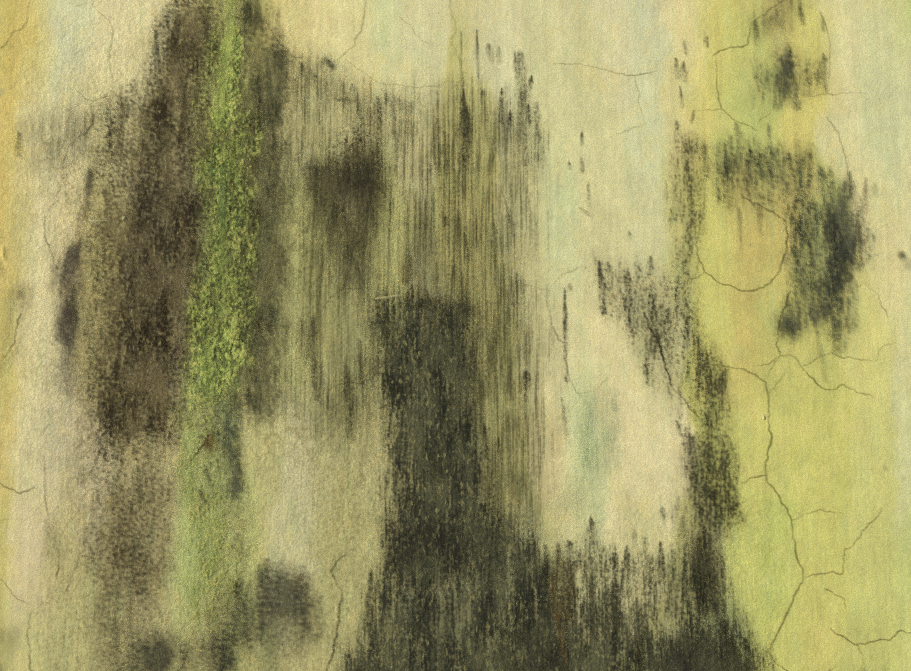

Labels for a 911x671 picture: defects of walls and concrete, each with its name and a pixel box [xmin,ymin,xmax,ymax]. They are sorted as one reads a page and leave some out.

damp [55,0,223,671]
damp [186,558,319,671]
damp [218,0,302,512]
damp [344,122,774,671]
damp [756,48,826,106]
damp [708,127,874,347]
crack [702,197,880,647]